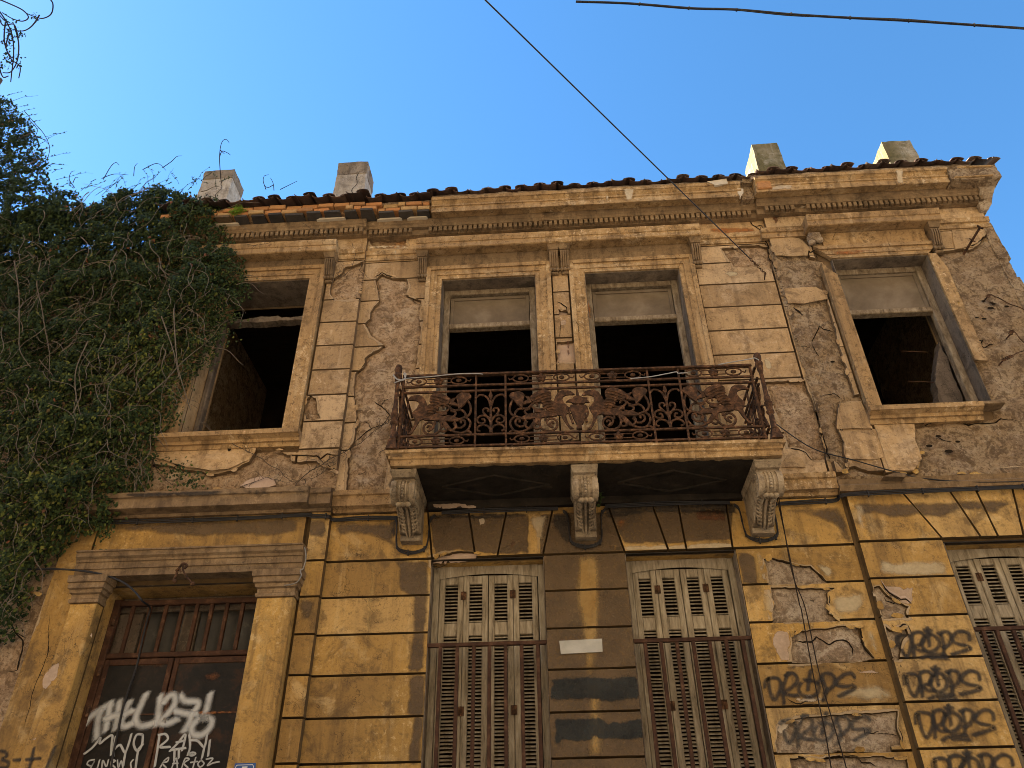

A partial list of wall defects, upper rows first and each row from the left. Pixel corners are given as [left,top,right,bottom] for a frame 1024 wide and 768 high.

flaking render [134,261,423,492]
flaking render [720,236,883,480]
crack [791,393,849,465]
flaking render [900,223,1024,477]
damp [396,561,428,764]
damp [431,504,756,768]
flaking render [759,554,913,673]
flaking render [775,688,909,768]
peeling [882,562,945,575]